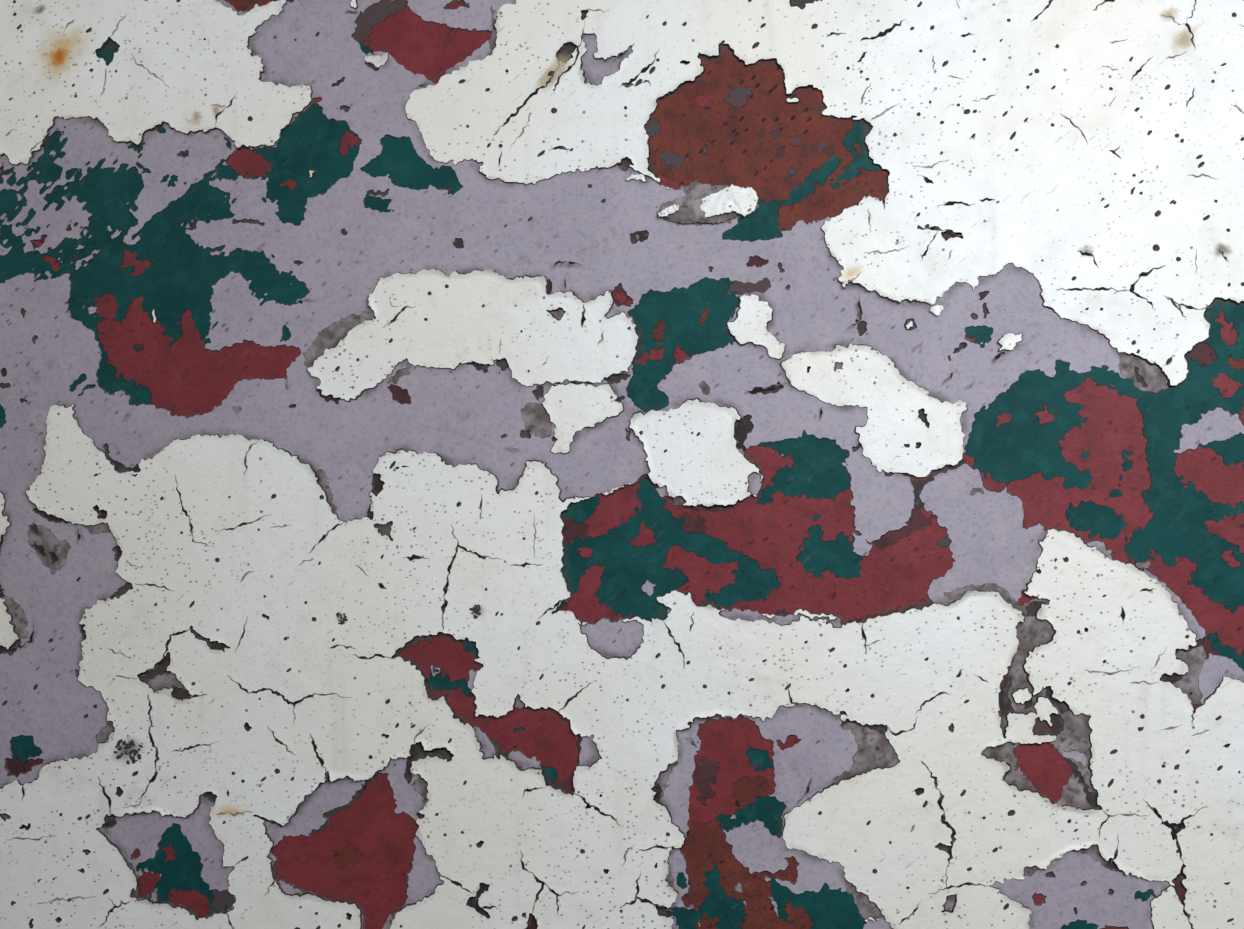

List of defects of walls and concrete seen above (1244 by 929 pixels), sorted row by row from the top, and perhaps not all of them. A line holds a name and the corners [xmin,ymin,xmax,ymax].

crack [847,160,994,330]
crack [1057,249,1229,317]
crack [406,499,543,630]
peeling [1065,500,1128,539]
crack [189,617,351,781]
peeling [392,633,602,793]
peeling [98,793,236,919]
peeling [255,742,451,929]
peeling [653,703,899,929]
crack [900,761,985,924]
peeling [989,844,1185,929]
crack [1099,801,1206,864]